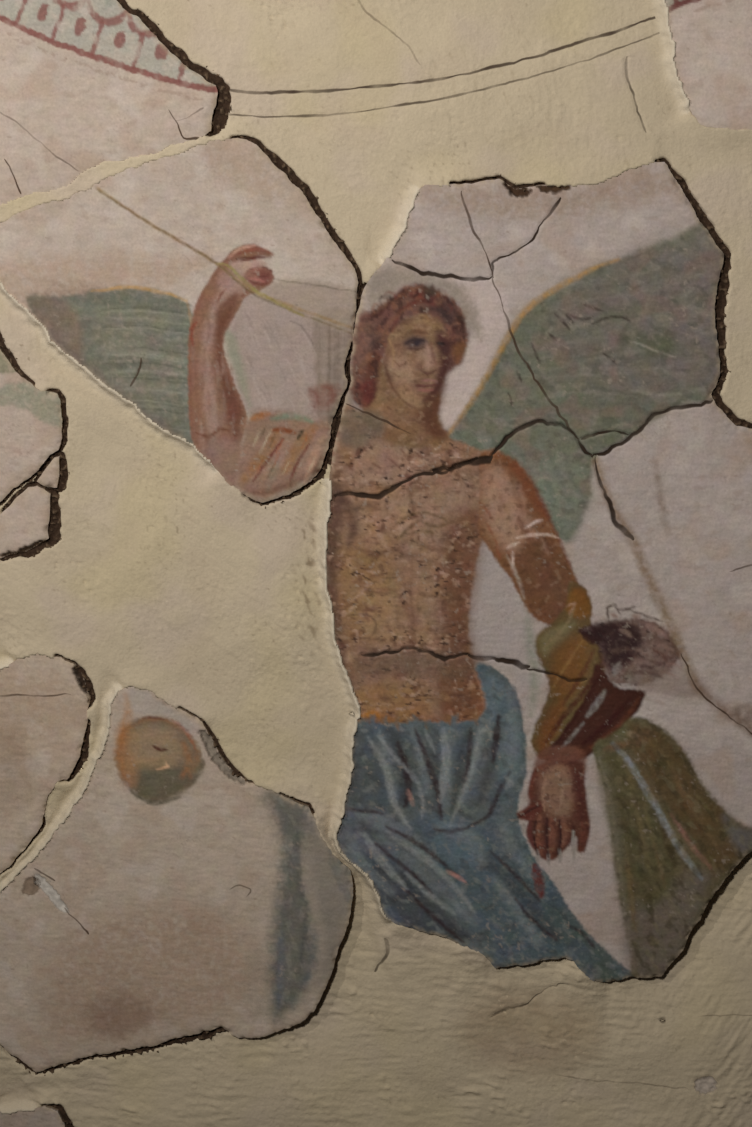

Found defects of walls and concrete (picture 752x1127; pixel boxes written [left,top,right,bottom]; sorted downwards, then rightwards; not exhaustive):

spalling [504,182,570,197]
crack [117,0,752,540]
crack [0,332,69,561]
spalling [1,540,43,557]
spalling [74,666,90,695]
crack [364,648,587,682]
crack [681,654,752,734]
spalling [200,731,245,784]
peeling [22,874,69,913]